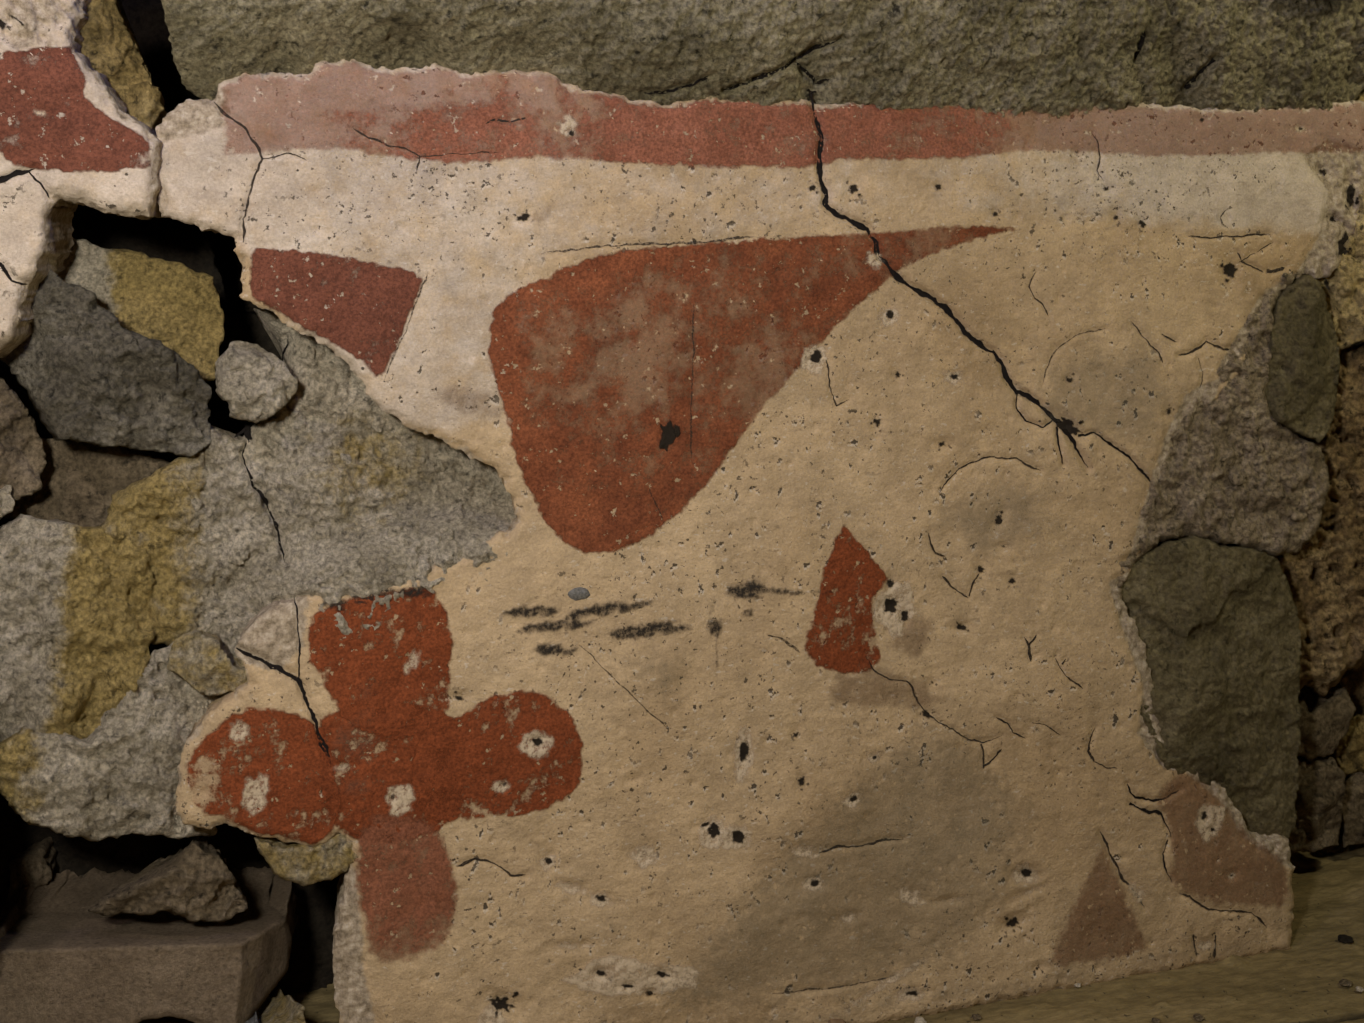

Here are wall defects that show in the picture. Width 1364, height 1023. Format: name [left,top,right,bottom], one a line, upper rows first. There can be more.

crack [1134,31,1147,59]
crack [0,168,49,197]
crack [0,262,26,285]
crack [644,39,1229,492]
spalling [1117,272,1330,588]
spalling [100,308,516,659]
crack [236,597,331,763]
spalling [230,722,248,741]
spalling [242,776,268,815]
spalling [386,785,415,816]
spalling [1195,806,1225,842]